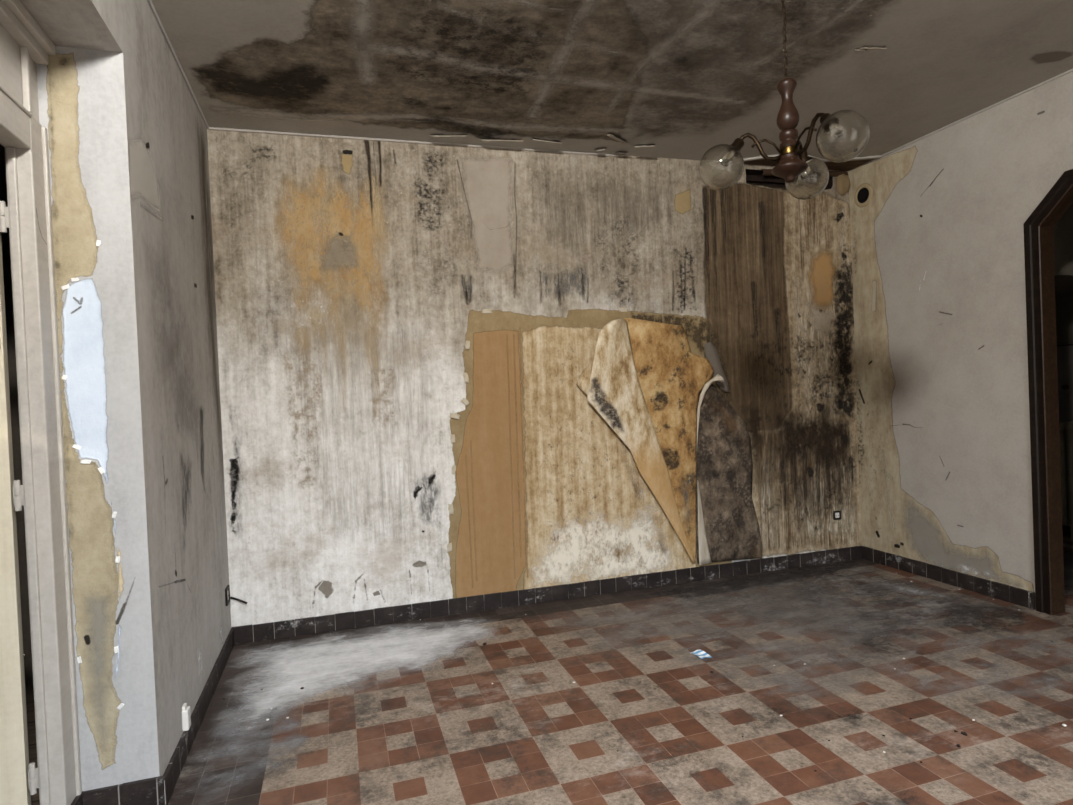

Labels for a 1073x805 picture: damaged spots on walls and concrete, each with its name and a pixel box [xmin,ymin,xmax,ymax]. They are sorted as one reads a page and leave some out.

water stain [193,0,888,141]
mould [415,152,449,229]
spalling [744,155,786,190]
peeling [46,53,125,770]
water stain [229,442,239,533]
water stain [413,474,438,532]
peeling [447,307,732,598]
mould [591,378,623,431]
mould [662,449,679,469]
water stain [672,183,862,557]
peeling [808,146,1034,592]
water stain [312,581,333,604]